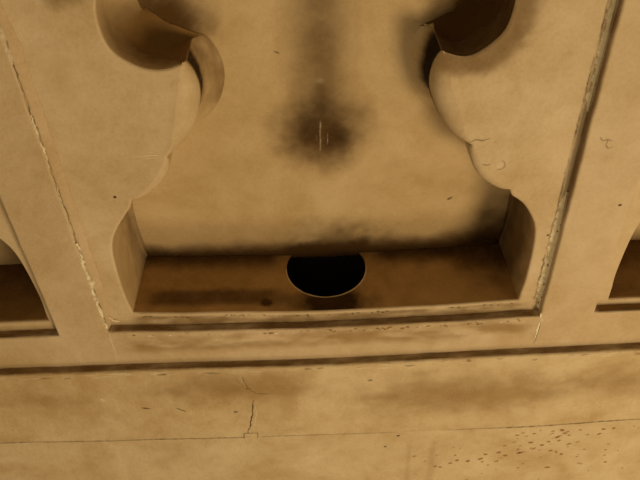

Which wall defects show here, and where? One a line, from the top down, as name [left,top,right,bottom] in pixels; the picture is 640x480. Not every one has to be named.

crack [0,1,120,358]
crack [535,191,569,338]